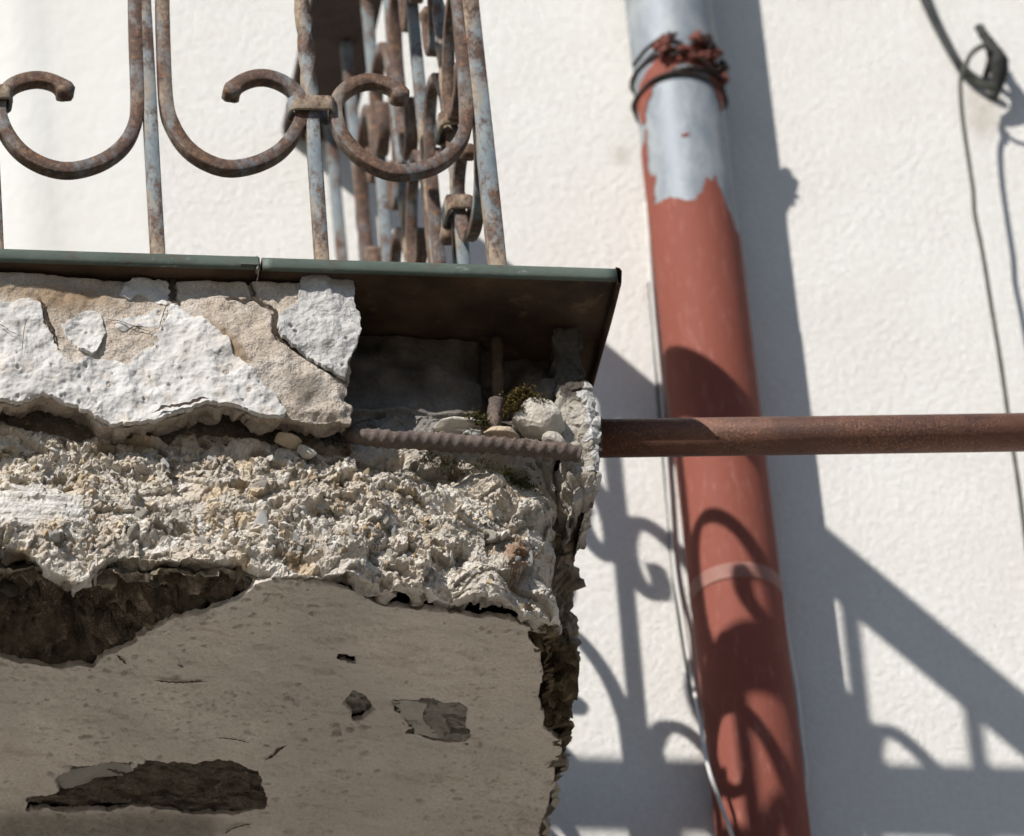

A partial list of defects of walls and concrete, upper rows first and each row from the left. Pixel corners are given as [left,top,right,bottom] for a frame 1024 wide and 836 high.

spalling [0,277,602,836]